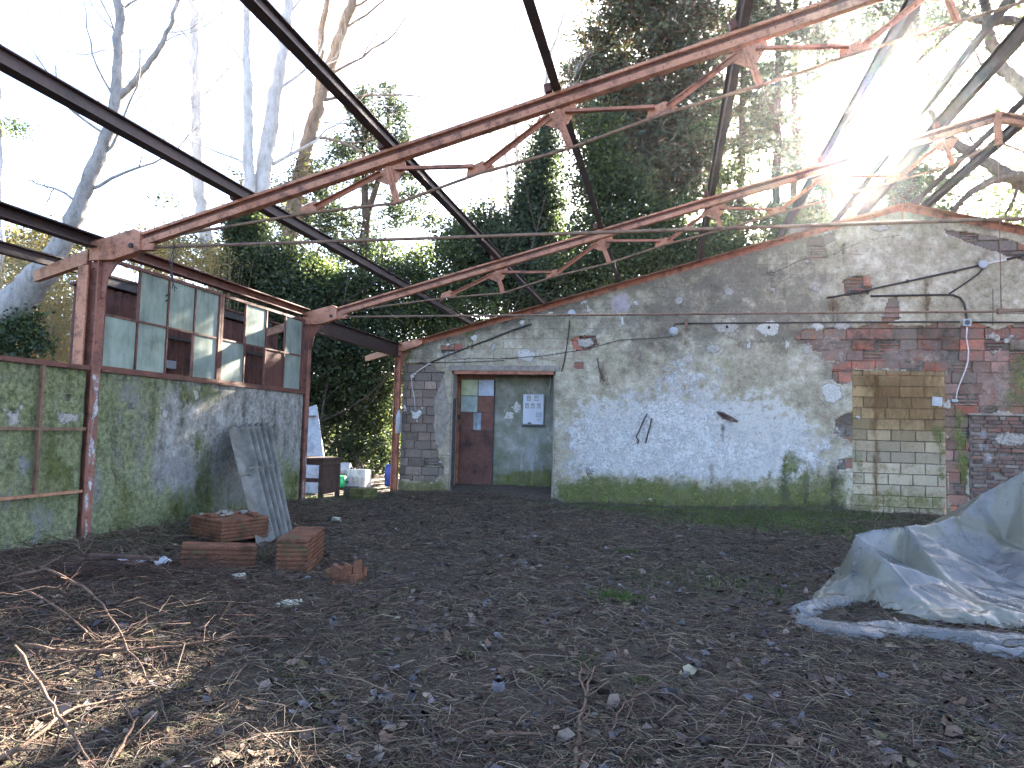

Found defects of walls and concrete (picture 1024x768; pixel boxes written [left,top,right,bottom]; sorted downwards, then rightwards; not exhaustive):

spalling [937,228,1024,258]
spalling [399,360,449,484]
spalling [569,331,597,369]
spalling [786,297,1024,514]